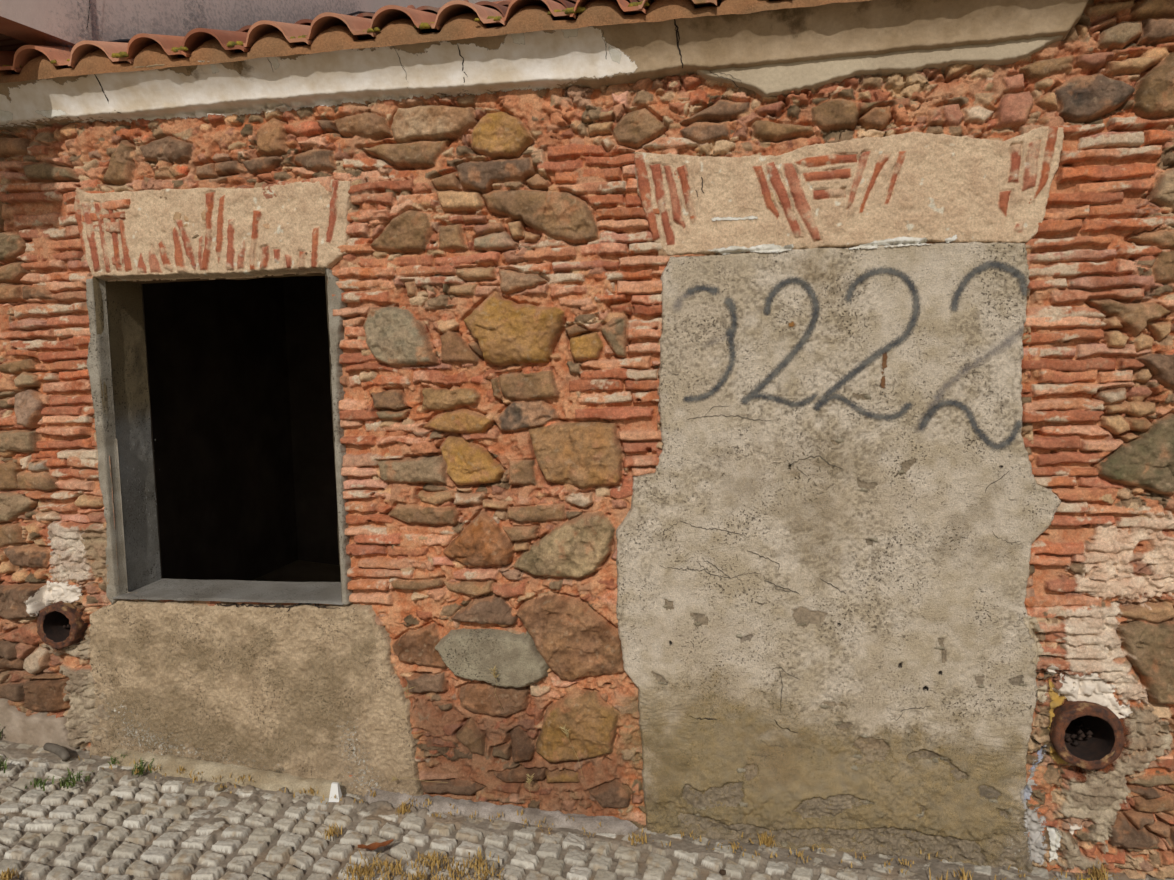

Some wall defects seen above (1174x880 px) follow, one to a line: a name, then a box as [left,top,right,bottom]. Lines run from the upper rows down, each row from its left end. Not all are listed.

peeling [0,26,638,127]
crack [674,19,742,88]
rust [1073,762,1114,783]